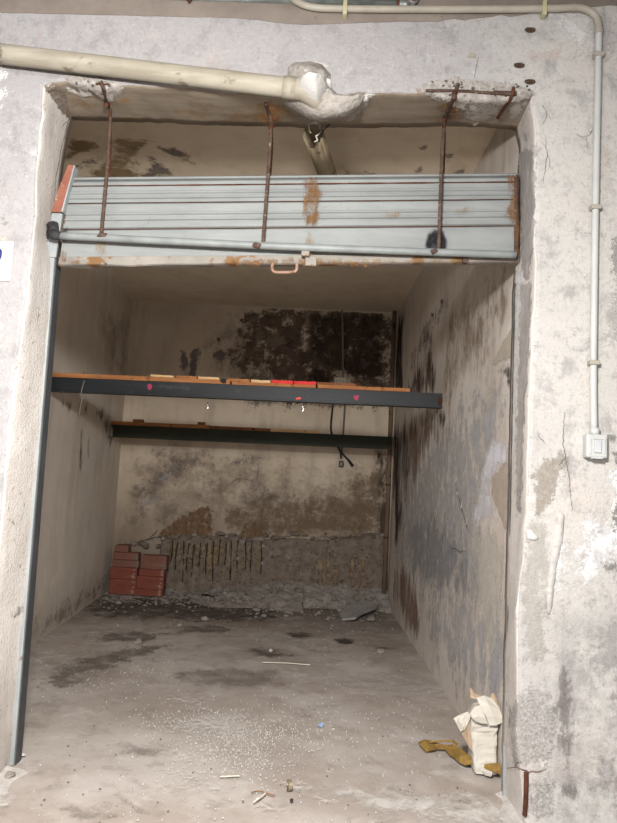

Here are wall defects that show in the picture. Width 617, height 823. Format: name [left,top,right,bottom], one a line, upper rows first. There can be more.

damp [65,139,172,177]
damp [160,148,194,164]
spalling [422,76,534,249]
damp [180,349,201,376]
damp [213,305,442,393]
crack [539,414,572,505]
damp [225,383,508,707]
damp [522,450,617,661]